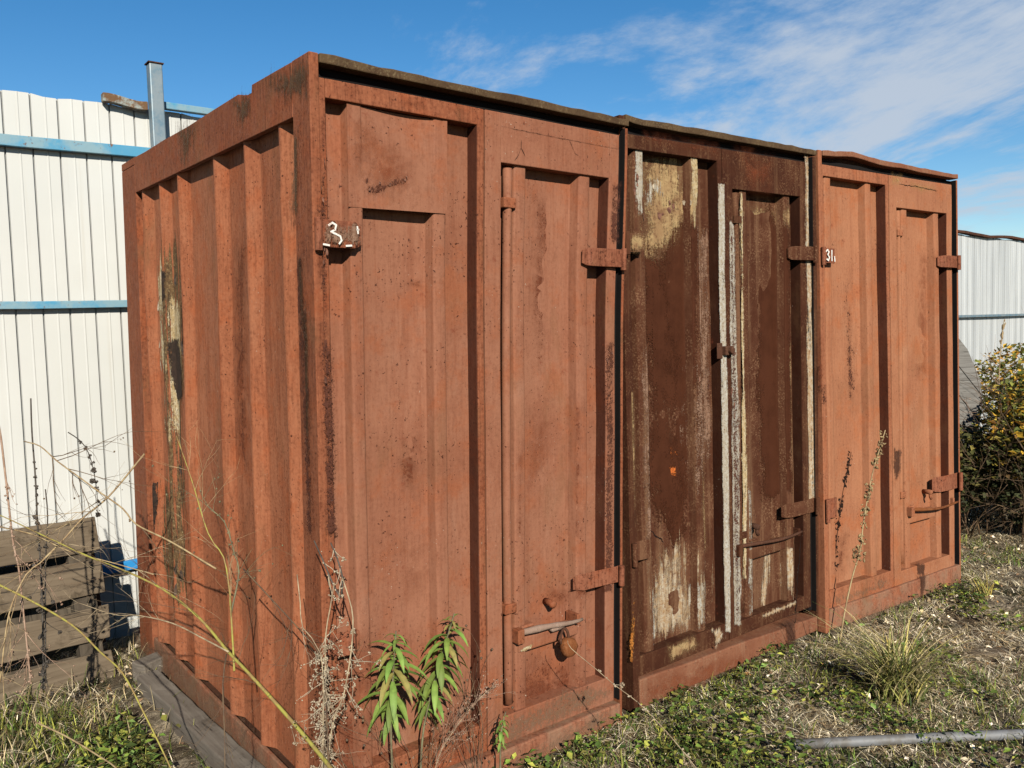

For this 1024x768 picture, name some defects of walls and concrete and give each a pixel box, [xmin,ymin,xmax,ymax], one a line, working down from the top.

peeling [152,228,189,607]
rust [296,233,337,536]
peeling [631,150,698,261]
rust [644,221,701,548]
peeling [648,184,796,660]
rust [756,202,793,502]